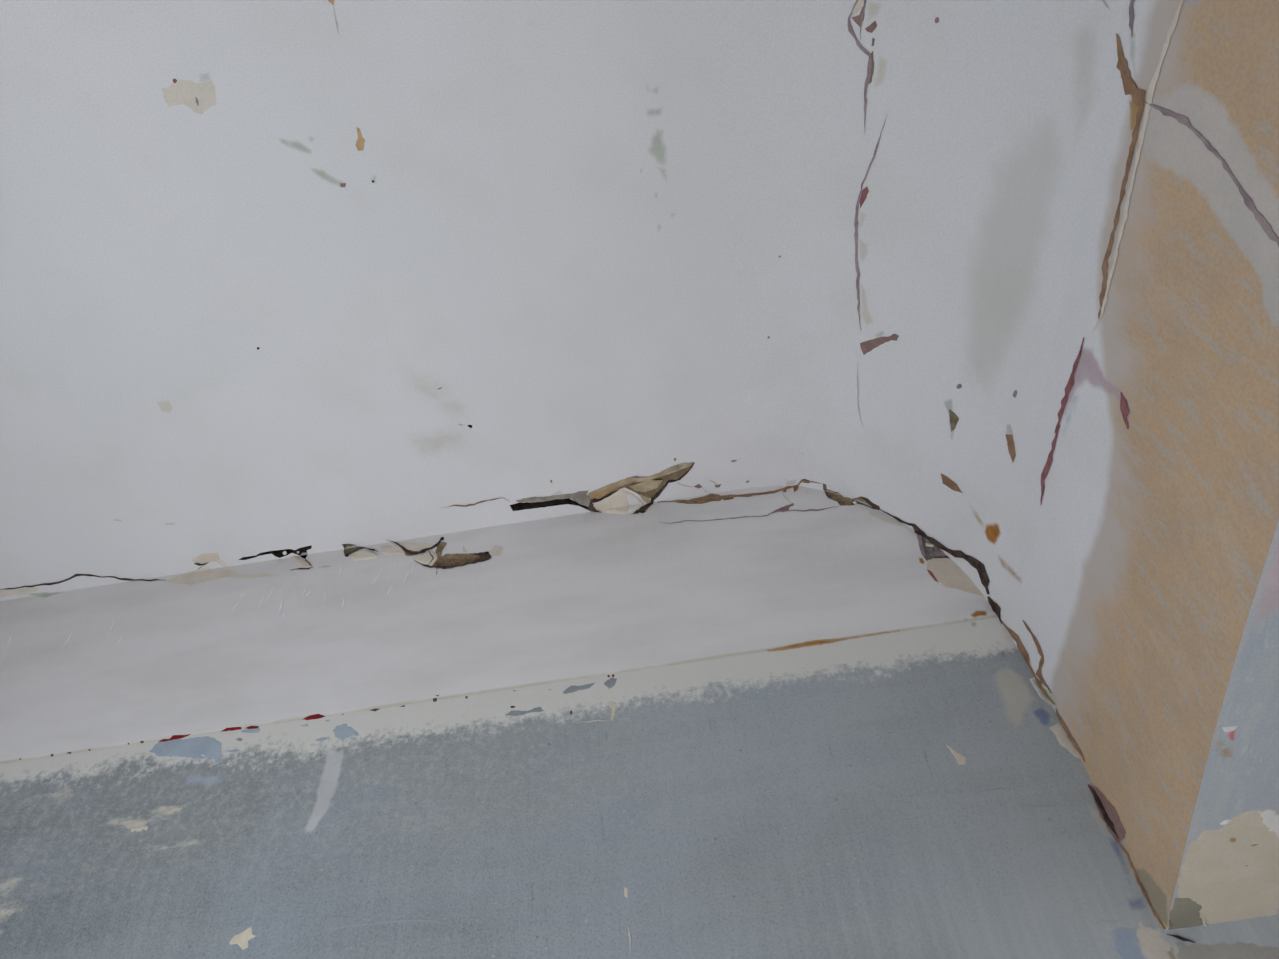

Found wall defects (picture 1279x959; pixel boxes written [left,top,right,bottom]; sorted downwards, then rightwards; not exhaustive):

crack [848,0,889,329]
crack [1040,0,1279,503]
flaking render [443,458,695,514]
crack [0,553,276,598]
peeling [990,651,1081,760]
peeling [1085,800,1178,959]
flaking render [1177,809,1279,925]